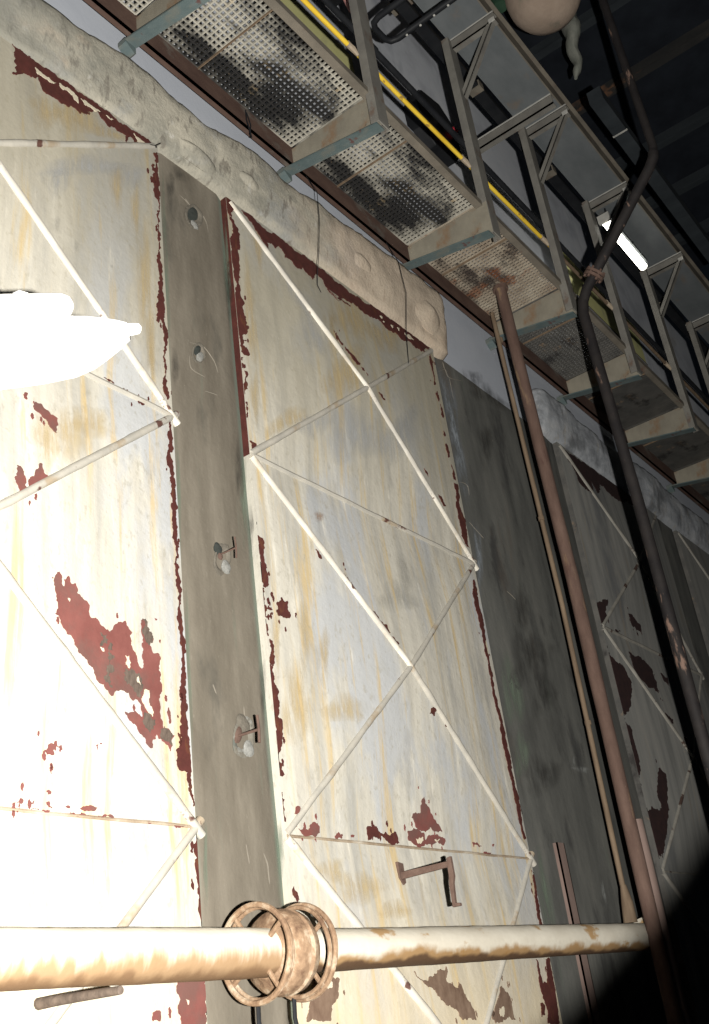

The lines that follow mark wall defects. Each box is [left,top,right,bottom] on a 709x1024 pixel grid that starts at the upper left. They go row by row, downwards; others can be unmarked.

peeling [12,44,172,400]
peeling [226,197,444,418]
peeling [23,392,58,433]
peeling [15,463,48,506]
peeling [52,422,195,806]
peeling [256,522,297,777]
peeling [607,647,673,786]
peeling [335,786,446,850]
peeling [647,759,669,859]
peeling [414,967,478,1024]
peeling [492,976,521,1024]
peeling [536,957,560,1024]